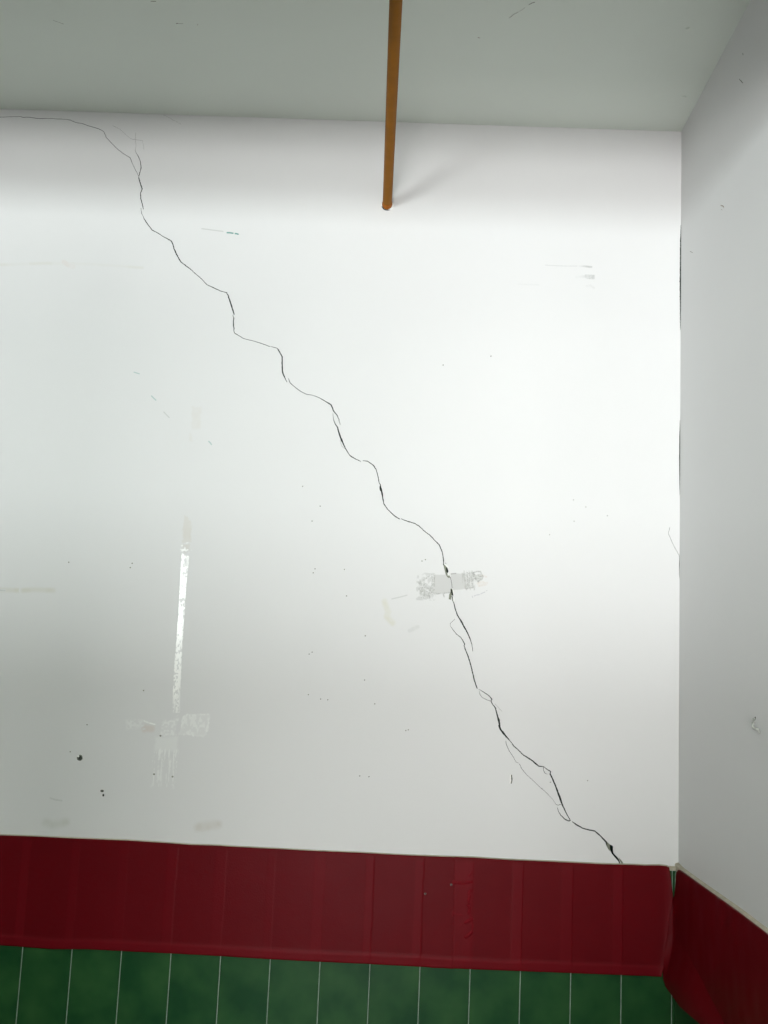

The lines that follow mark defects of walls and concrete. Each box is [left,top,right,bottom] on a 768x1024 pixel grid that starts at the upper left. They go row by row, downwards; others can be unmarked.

crack [13,116,620,862]